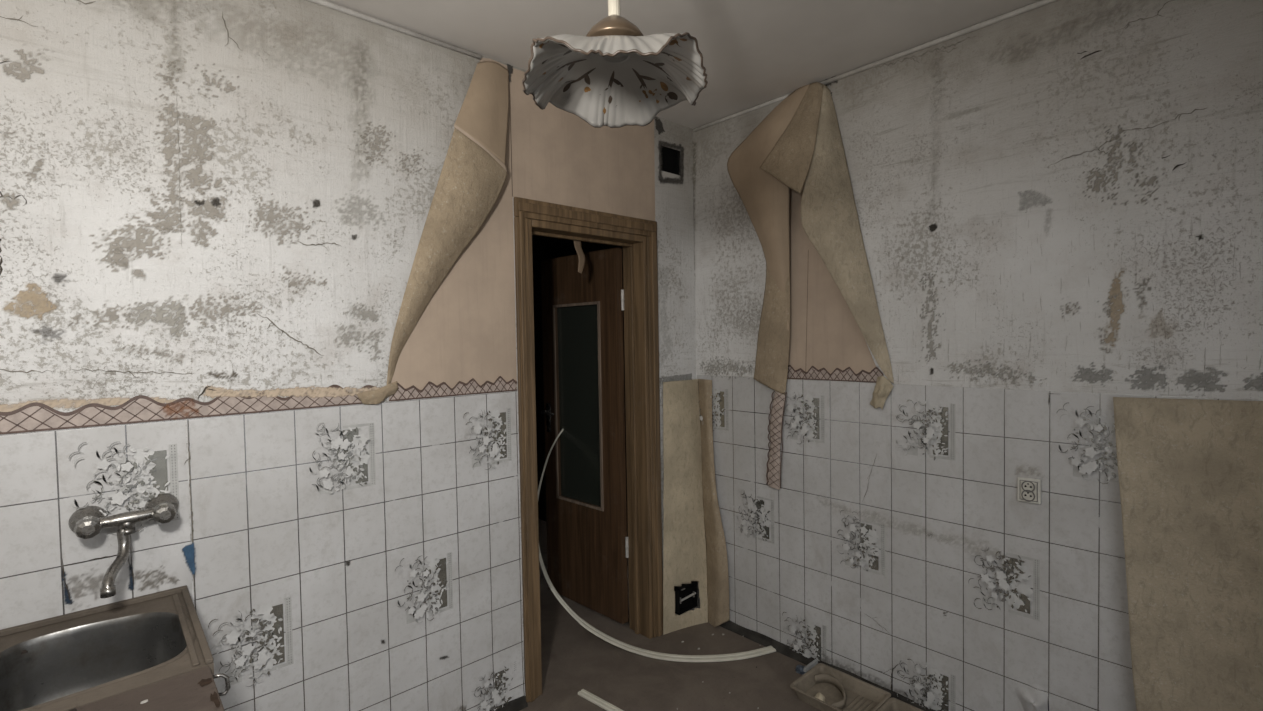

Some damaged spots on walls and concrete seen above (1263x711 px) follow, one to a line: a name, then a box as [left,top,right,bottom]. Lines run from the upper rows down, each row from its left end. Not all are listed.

crack [0,368,188,378]
peeling [91,62,239,277]
peeling [335,61,509,385]
peeling [701,82,894,395]
peeling [1073,271,1227,392]
peeling [1244,373,1263,390]